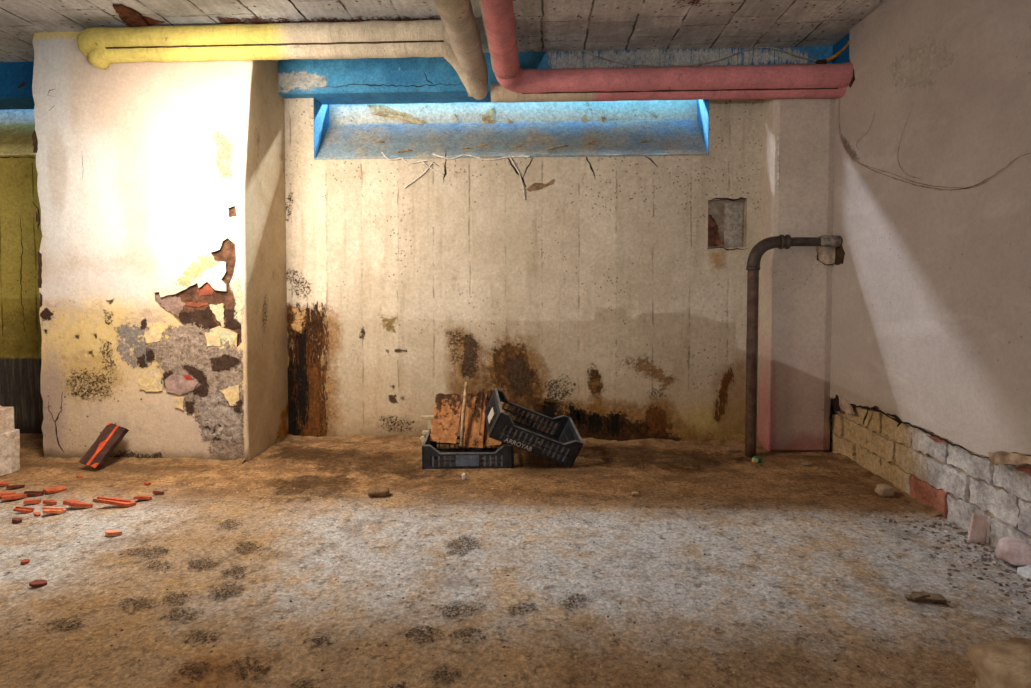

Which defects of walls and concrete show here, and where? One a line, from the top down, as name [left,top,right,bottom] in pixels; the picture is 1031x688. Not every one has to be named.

crack [20,203,40,331]
flaking render [67,238,244,460]
flaking render [831,395,1031,548]